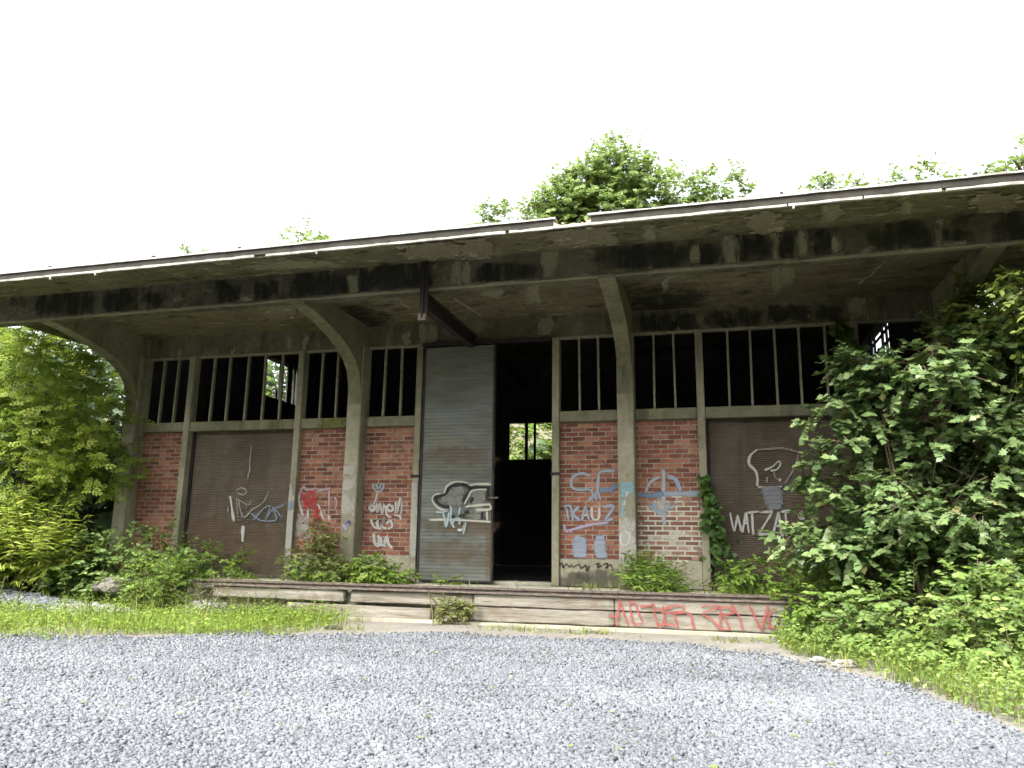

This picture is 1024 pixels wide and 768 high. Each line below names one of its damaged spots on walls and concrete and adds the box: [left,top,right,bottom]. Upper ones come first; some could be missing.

spalling [968,191,1024,214]
spalling [739,211,787,235]
leakage [868,200,971,251]
leakage [996,211,1024,242]
spalling [396,237,495,261]
leakage [451,251,559,284]
leakage [603,204,868,331]
leakage [36,288,161,315]
leakage [237,258,432,327]